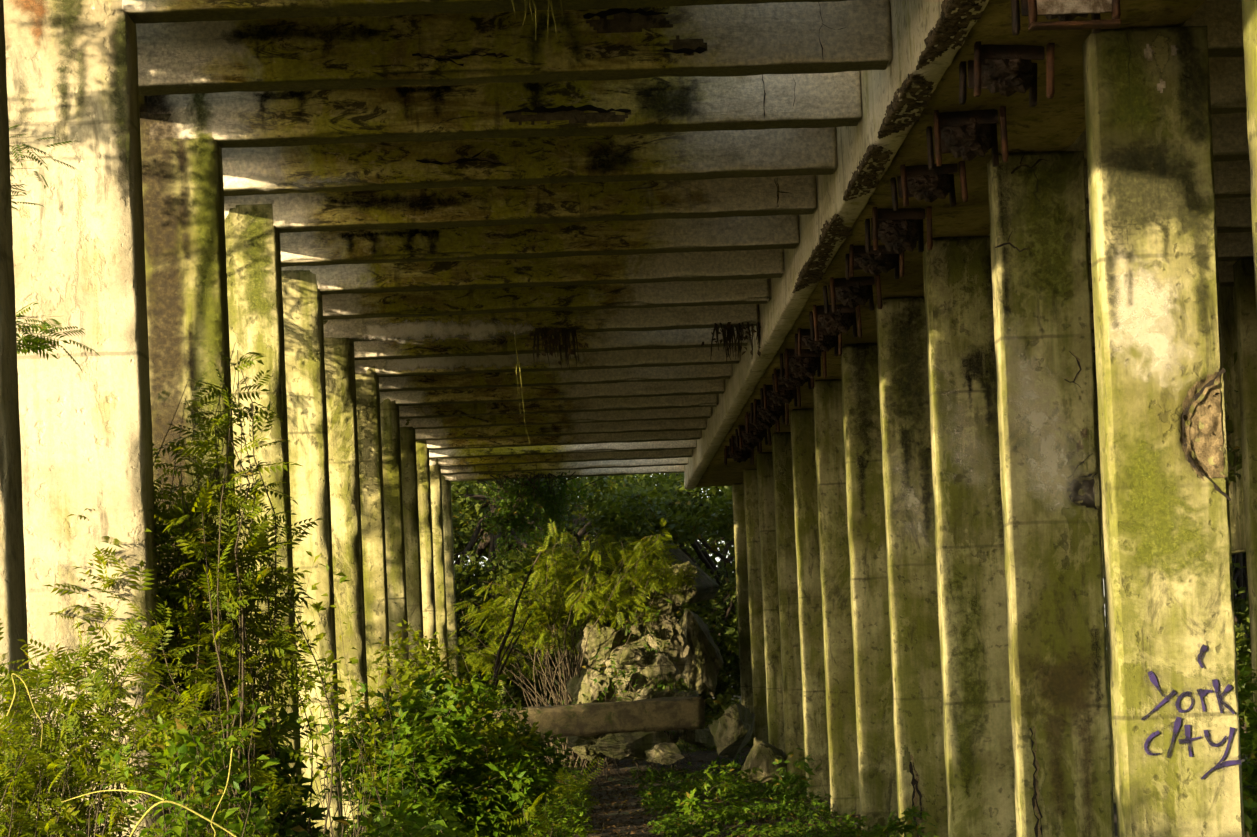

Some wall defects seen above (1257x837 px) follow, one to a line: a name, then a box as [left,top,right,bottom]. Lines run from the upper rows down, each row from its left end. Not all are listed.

water stain [254,91,312,129]
water stain [636,80,697,119]
spalling [843,0,986,201]
water stain [1172,23,1209,141]
water stain [293,178,483,211]
spalling [792,214,853,293]
water stain [115,95,195,597]
spalling [1180,368,1232,501]
crack [909,754,923,837]
water stain [957,723,973,795]
crack [1029,726,1043,837]
water stain [1034,629,1103,833]